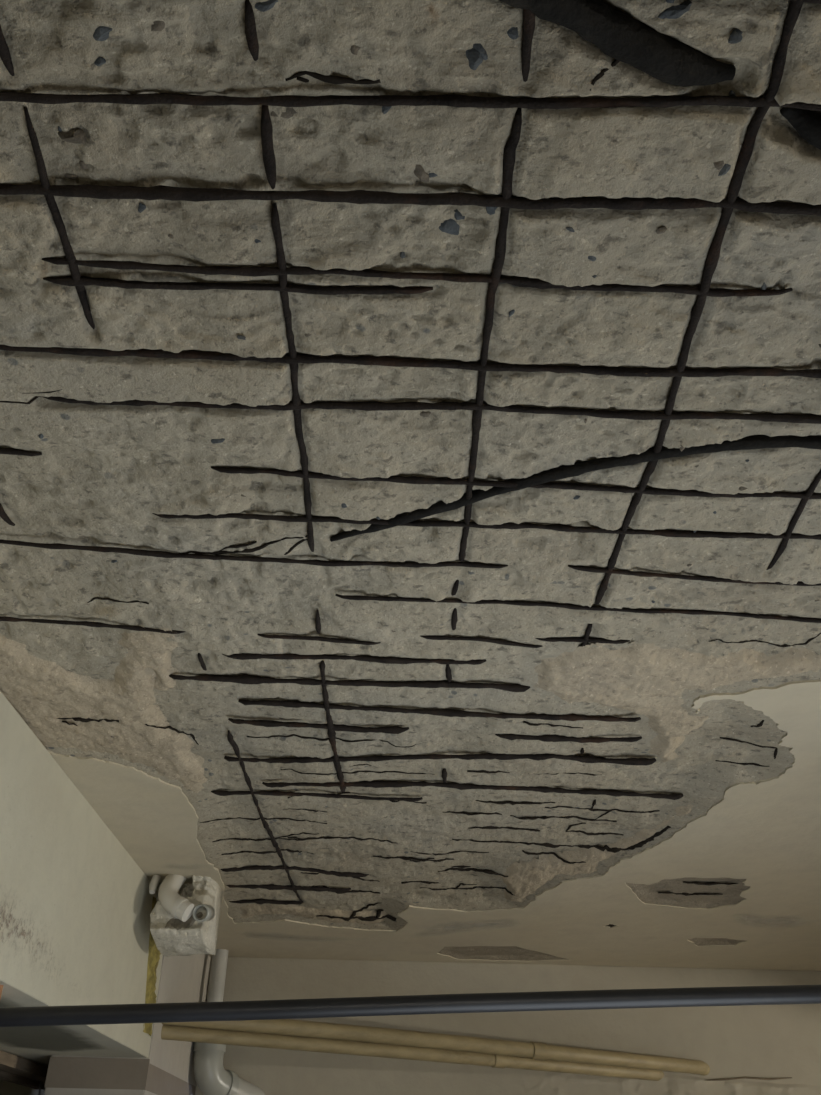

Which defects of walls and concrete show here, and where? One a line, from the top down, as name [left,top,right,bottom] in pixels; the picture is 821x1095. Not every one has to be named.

spalling [0,0,821,372]
spalling [0,344,821,930]